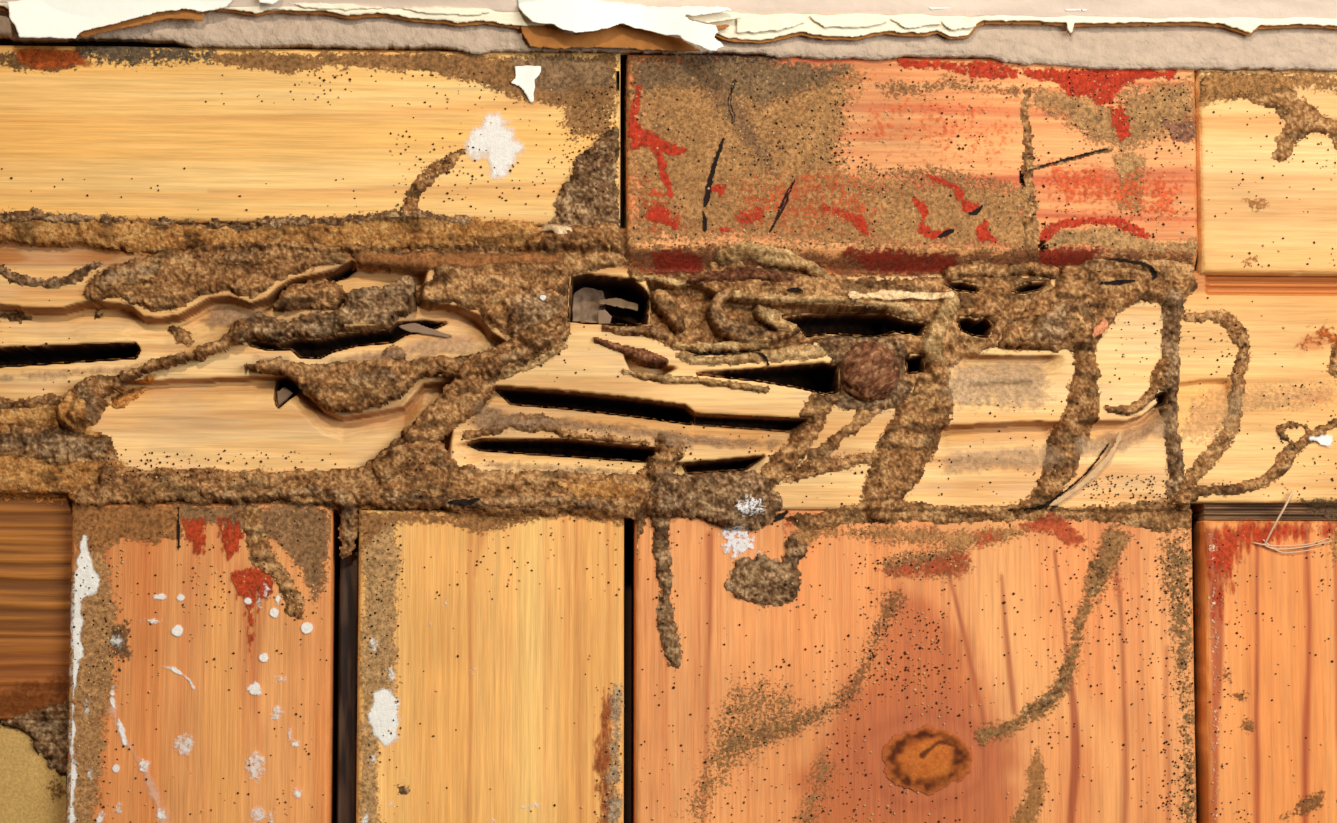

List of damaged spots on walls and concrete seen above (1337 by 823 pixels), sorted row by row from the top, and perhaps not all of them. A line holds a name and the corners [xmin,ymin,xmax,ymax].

spalling [0,0,1337,103]
crack [702,79,736,231]
crack [770,179,795,232]